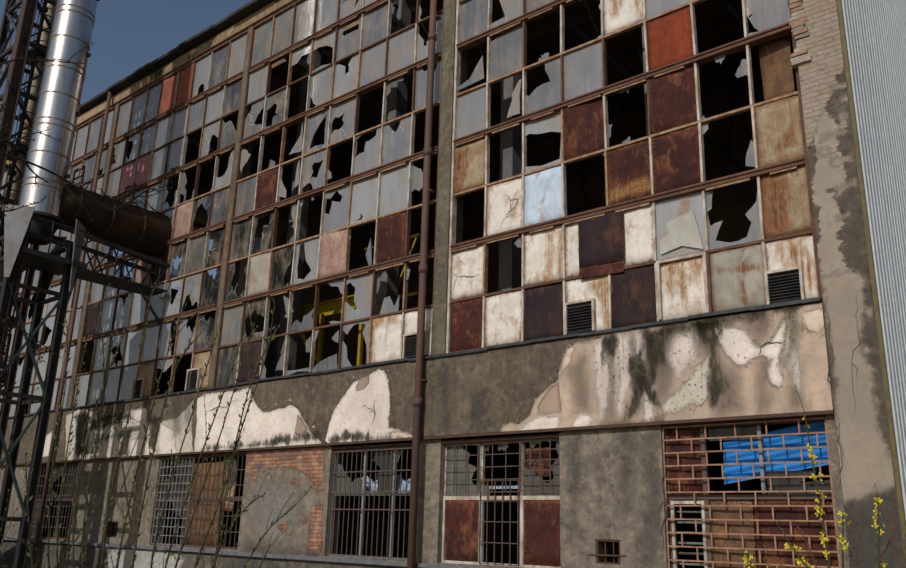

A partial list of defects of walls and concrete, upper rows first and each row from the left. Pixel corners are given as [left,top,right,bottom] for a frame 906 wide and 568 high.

corrosion [665,256,702,297]
spalling [500,0,895,505]
corrosion [776,241,818,289]
leakage [593,305,803,424]
spalling [30,429,54,461]
leakage [75,411,132,458]
leakage [149,417,160,453]
spalling [65,368,413,556]